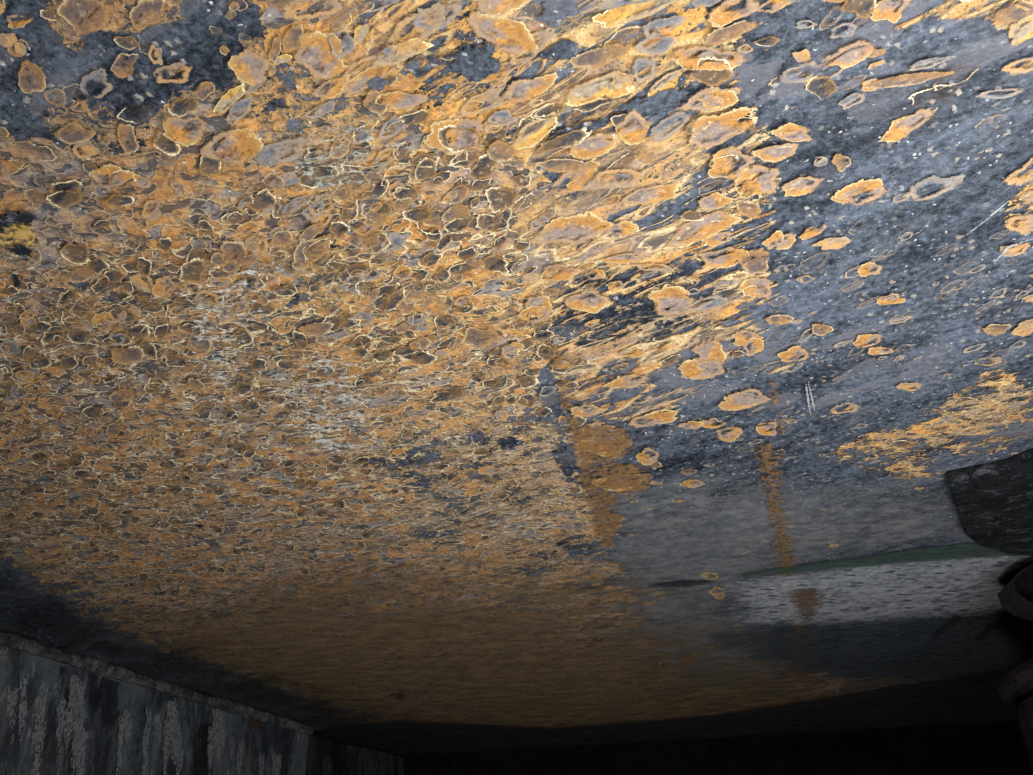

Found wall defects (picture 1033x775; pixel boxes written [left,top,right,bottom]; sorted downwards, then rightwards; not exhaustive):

corrosion [769,0,1033,110]
peeling [878,69,979,143]
corrosion [831,178,889,205]
corrosion [903,174,966,201]
corrosion [1000,158,1033,257]
peeling [765,311,817,346]
peeling [888,304,916,325]
peeling [932,264,988,310]
peeling [978,287,1030,309]
corrosion [983,319,1033,337]
corrosion [0,0,870,728]
corrosion [826,357,1033,490]